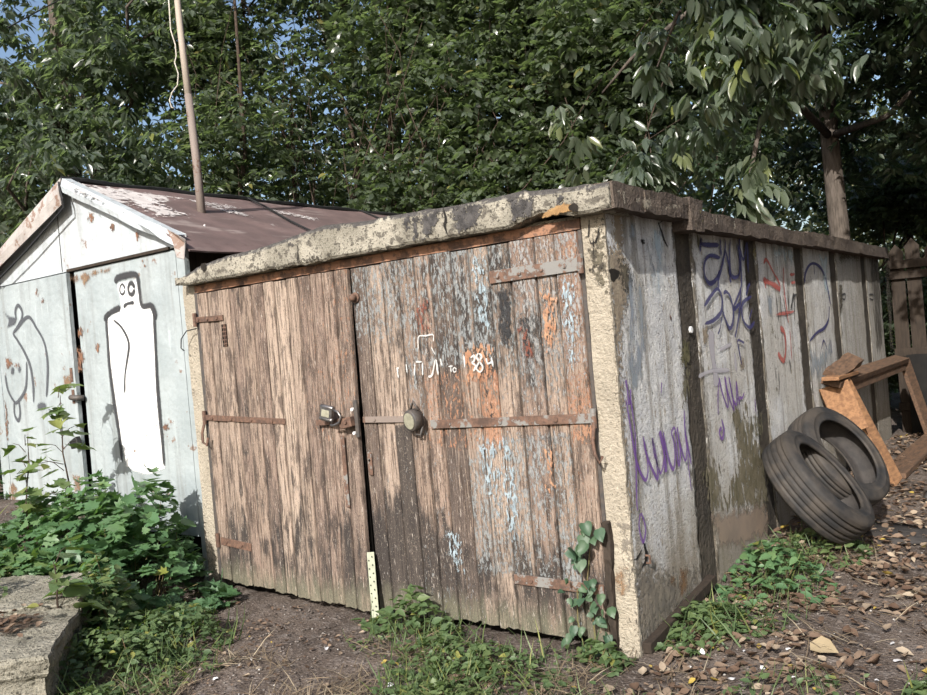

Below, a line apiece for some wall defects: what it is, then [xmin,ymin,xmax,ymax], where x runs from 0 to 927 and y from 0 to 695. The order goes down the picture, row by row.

damp [401,209,438,241]
damp [450,201,483,234]
damp [509,197,535,221]
spalling [542,202,578,218]
peeling [464,252,579,384]
damp [711,504,768,547]